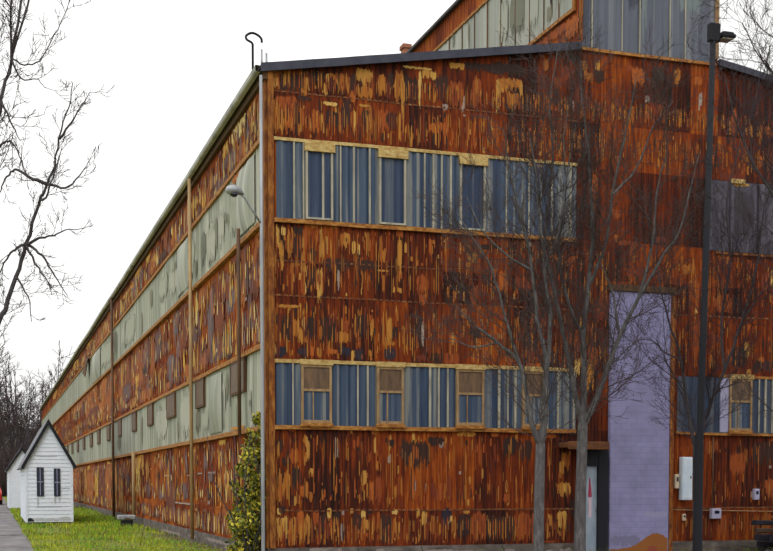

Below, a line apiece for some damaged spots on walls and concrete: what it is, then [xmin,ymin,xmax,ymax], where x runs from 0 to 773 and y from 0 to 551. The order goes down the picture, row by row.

peeling [274,65,547,153]
rust [274,64,773,213]
peeling [592,101,731,169]
rust [56,97,259,394]
peeling [55,245,260,438]
peeling [275,225,501,362]
rust [274,225,609,368]
rust [660,251,773,373]
rust [73,440,256,536]
peeling [276,435,473,551]
peeling [557,511,567,531]
rust [703,438,773,539]